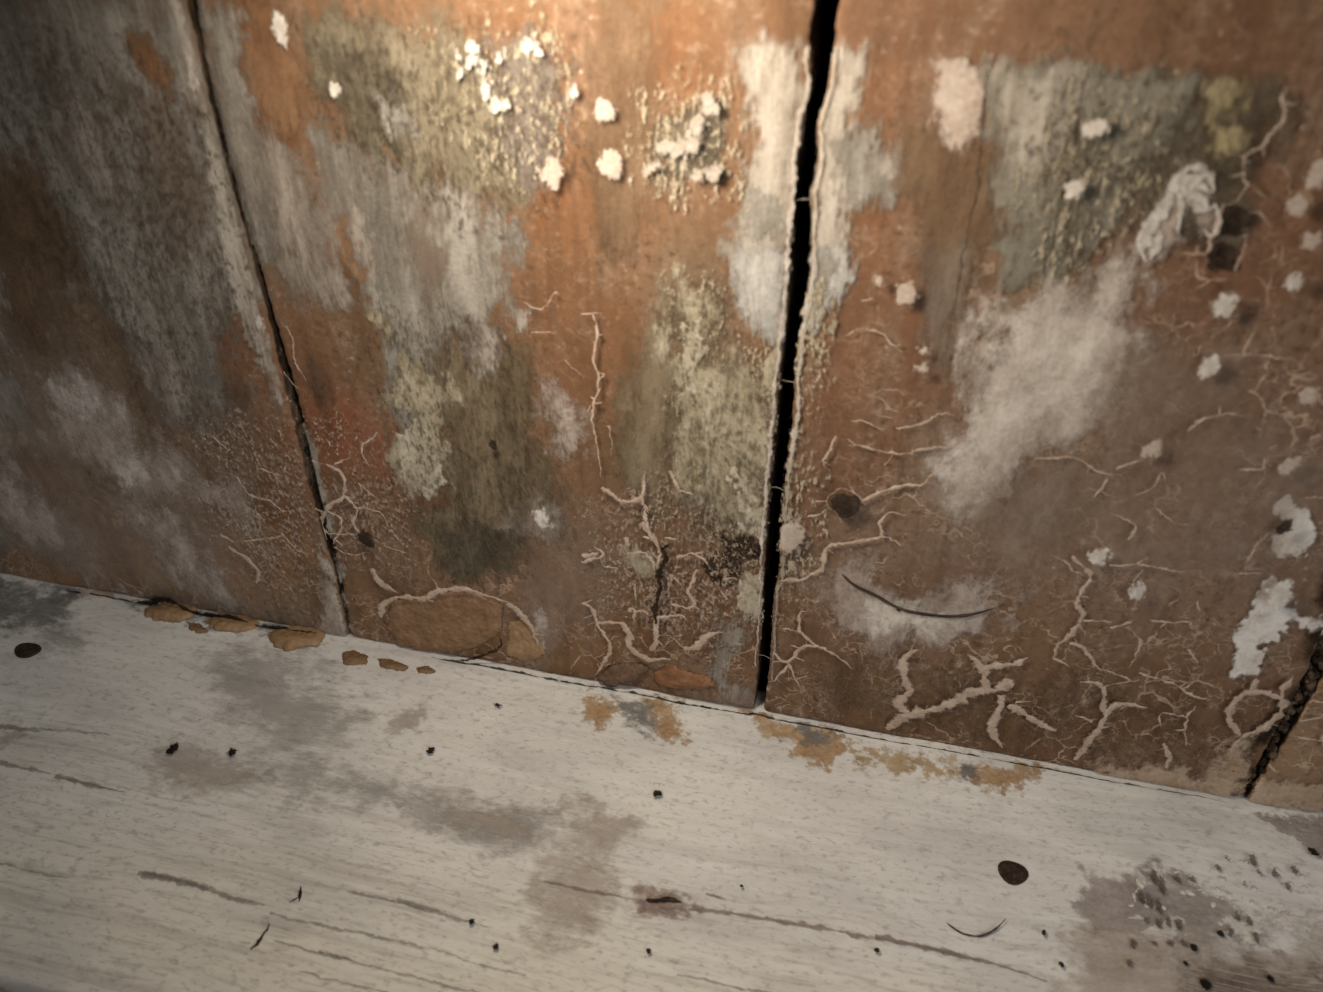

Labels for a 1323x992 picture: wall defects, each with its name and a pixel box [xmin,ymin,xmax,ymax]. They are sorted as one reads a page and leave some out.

leakage [0,371,119,644]
leakage [0,0,569,584]
leakage [585,0,728,260]
crack [66,292,1323,803]
leakage [612,30,806,628]
leakage [811,40,1299,376]
leakage [1141,440,1162,458]
leakage [1058,924,1323,992]